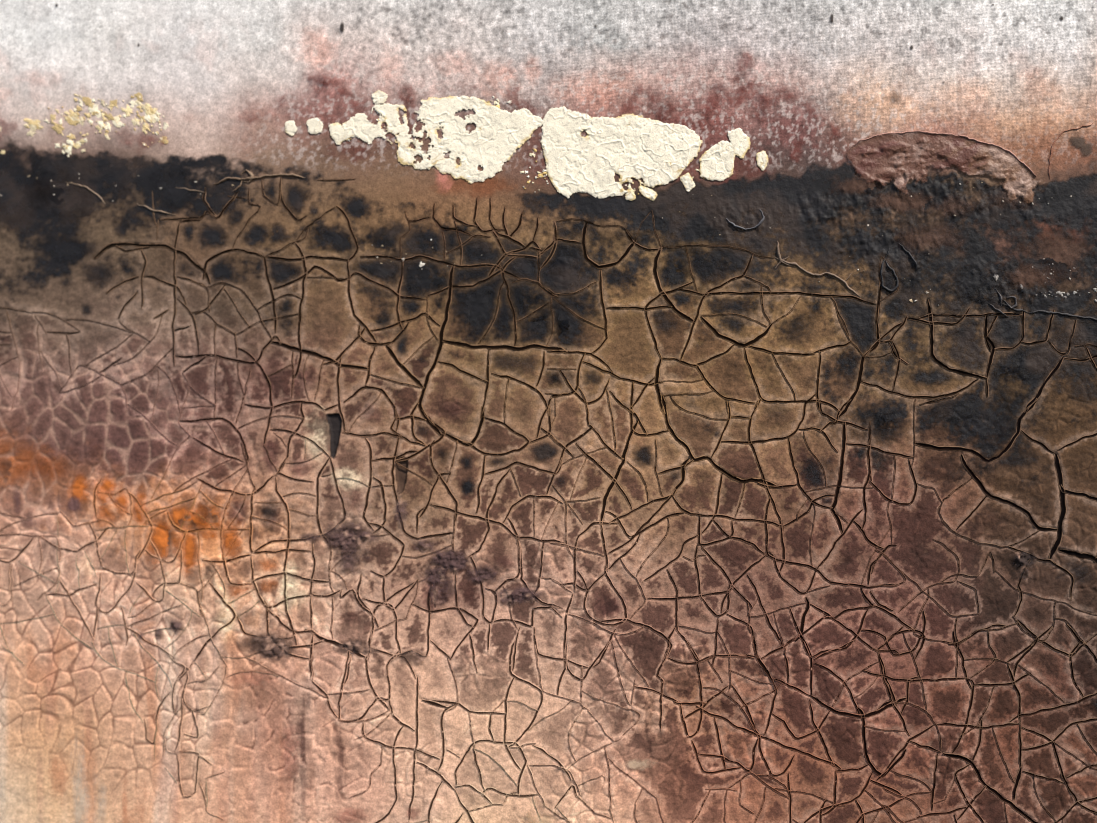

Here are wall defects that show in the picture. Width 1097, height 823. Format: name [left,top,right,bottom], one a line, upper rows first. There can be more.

peeling [372,90,388,105]
peeling [285,118,346,143]
peeling [625,185,657,201]
peeling [680,173,696,191]
leakage [0,143,274,290]
leakage [212,260,297,282]
leakage [245,162,1097,475]
leakage [462,481,474,494]
rust [153,509,236,567]